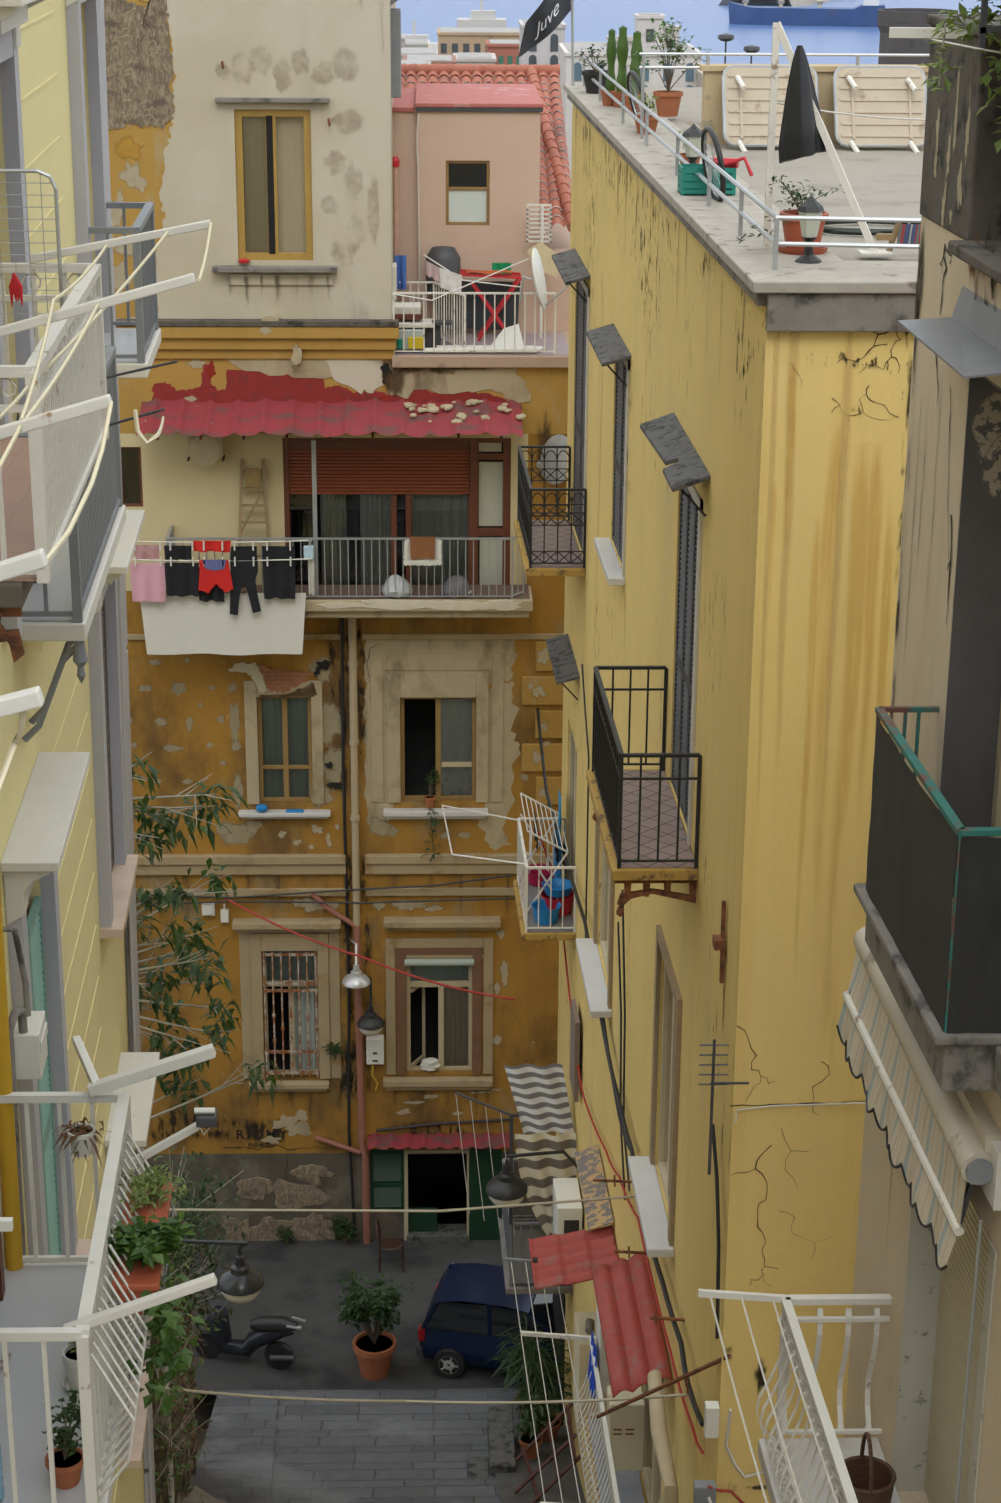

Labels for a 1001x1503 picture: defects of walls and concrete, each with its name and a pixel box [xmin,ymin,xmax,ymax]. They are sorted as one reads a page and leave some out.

spalling [259,316,280,335]
peeling [151,343,532,409]
damp [583,127,679,333]
crack [791,332,901,420]
crack [936,358,952,623]
flaking render [216,657,342,849]
flaking render [363,639,550,851]
spalling [220,1164,335,1241]
crack [730,1026,865,1286]